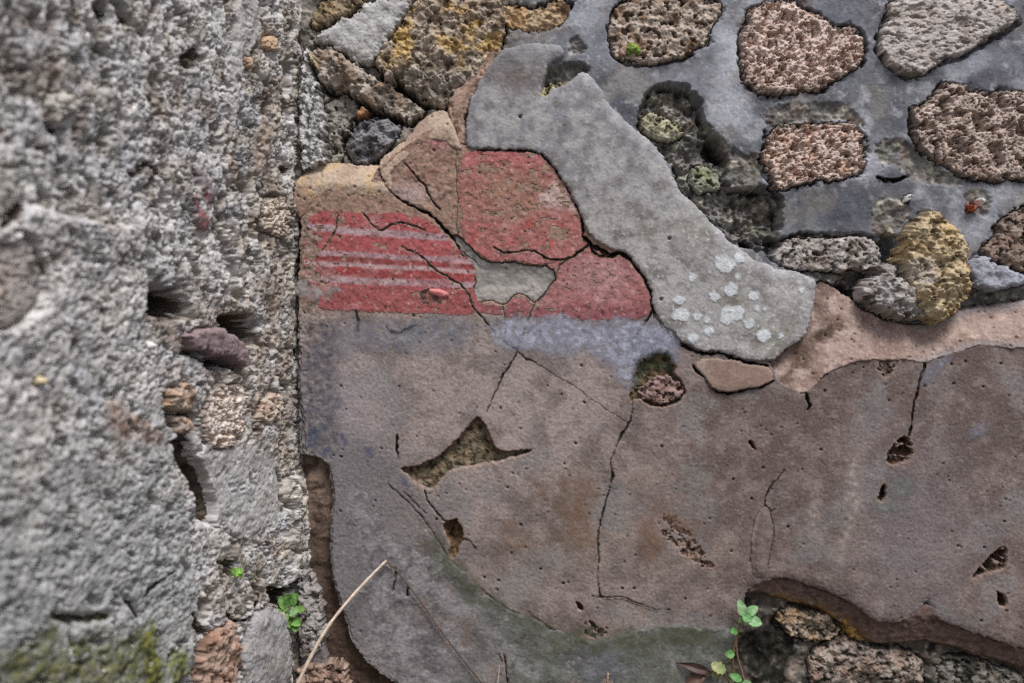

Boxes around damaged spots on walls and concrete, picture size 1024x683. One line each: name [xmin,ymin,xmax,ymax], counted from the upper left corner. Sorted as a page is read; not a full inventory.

crack [363,149,774,611]
flaking render [877,361,892,377]
flaking render [403,417,529,488]
flaking render [886,436,911,464]
flaking render [444,519,464,557]
flaking render [661,514,713,568]
flaking render [973,548,1005,578]